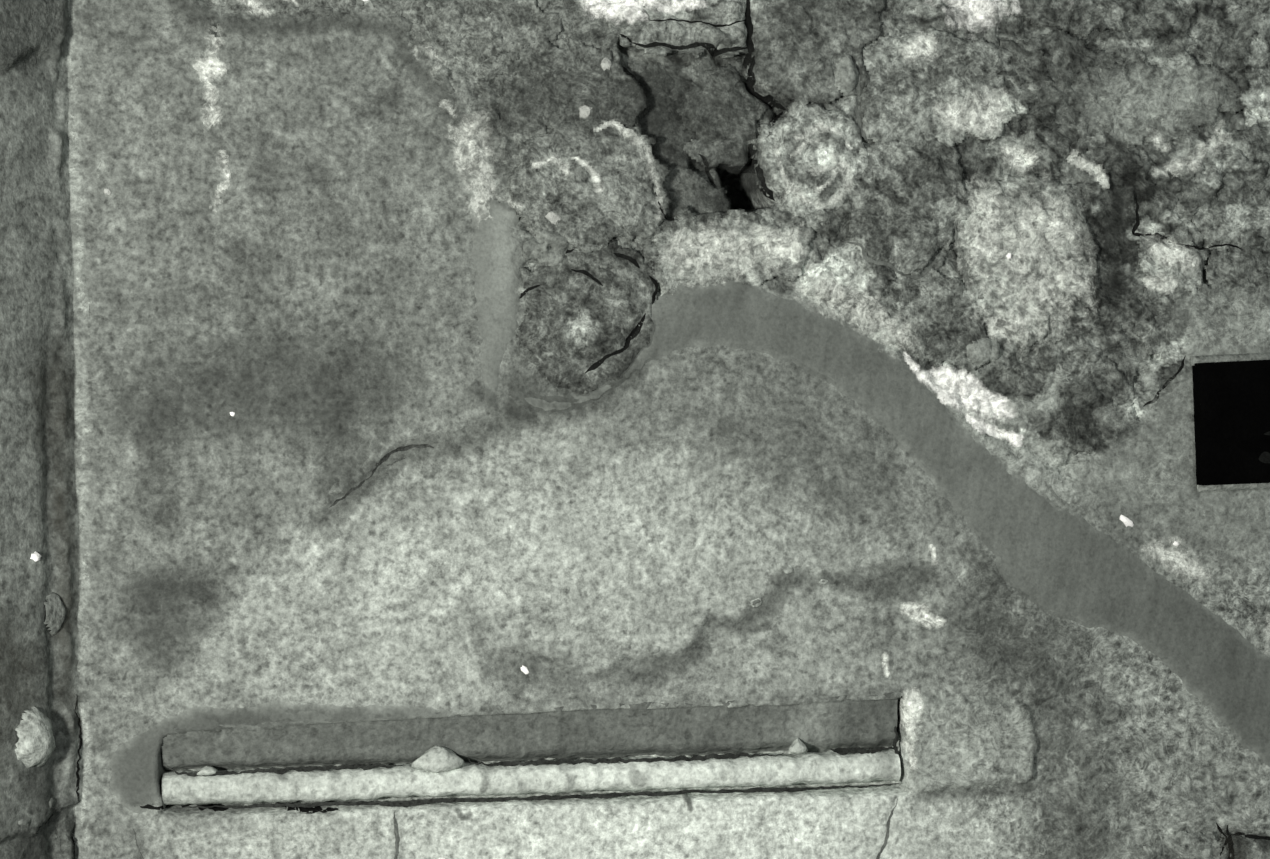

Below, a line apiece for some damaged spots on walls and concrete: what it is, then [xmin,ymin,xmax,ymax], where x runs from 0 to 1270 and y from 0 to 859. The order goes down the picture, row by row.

peeling [579,105,593,119]
peeling [600,57,612,71]
crack [620,0,786,201]
peeling [545,211,561,225]
crack [1132,198,1244,250]
crack [565,249,658,373]
leakage [799,269,1080,508]
leakage [1142,539,1209,580]
leakage [901,603,945,628]
crack [2,701,82,859]
crack [134,726,899,859]
leakage [897,690,1067,791]